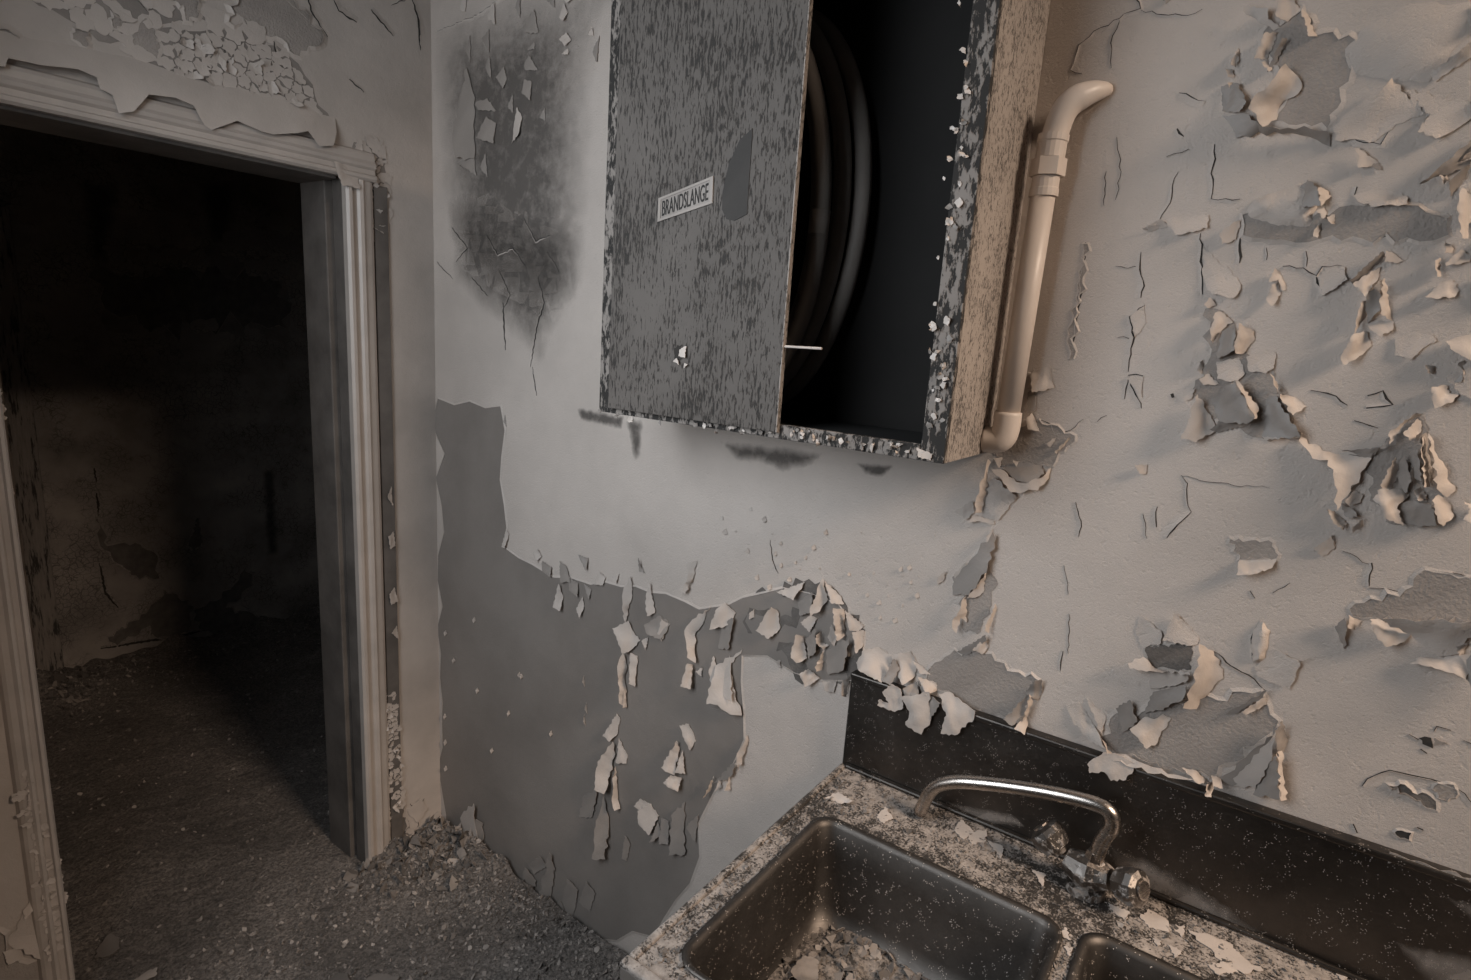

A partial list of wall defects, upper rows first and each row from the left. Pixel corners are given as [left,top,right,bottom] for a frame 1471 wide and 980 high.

peeling [0,0,394,242]
peeling [437,0,571,253]
crack [1102,137,1121,206]
crack [1156,92,1341,297]
peeling [1221,0,1425,170]
crack [1065,242,1146,422]
peeling [1170,140,1471,556]
peeling [435,364,1085,942]
peeling [1067,613,1308,801]
peeling [1226,534,1282,575]
flaking render [1335,566,1471,685]
flaking render [1362,770,1471,890]